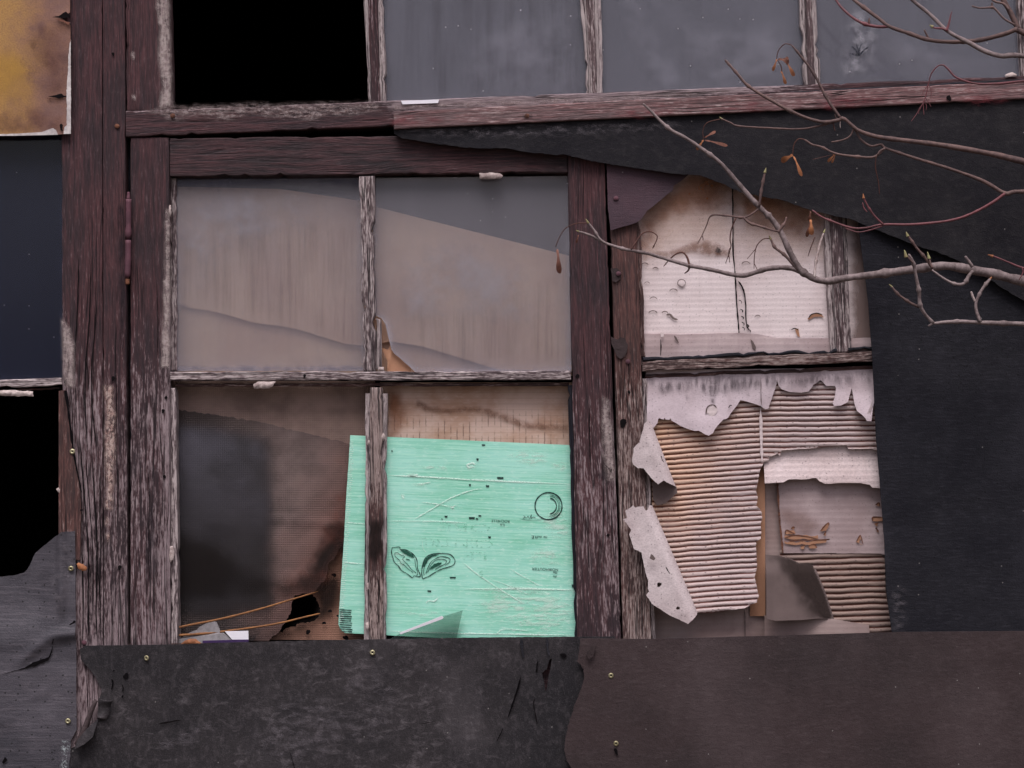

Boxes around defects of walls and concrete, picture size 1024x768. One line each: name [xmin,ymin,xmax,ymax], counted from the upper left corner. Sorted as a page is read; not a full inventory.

water stain [668,178,722,207]
water stain [745,196,804,225]
peeling [623,420,697,624]
peeling [784,522,830,549]